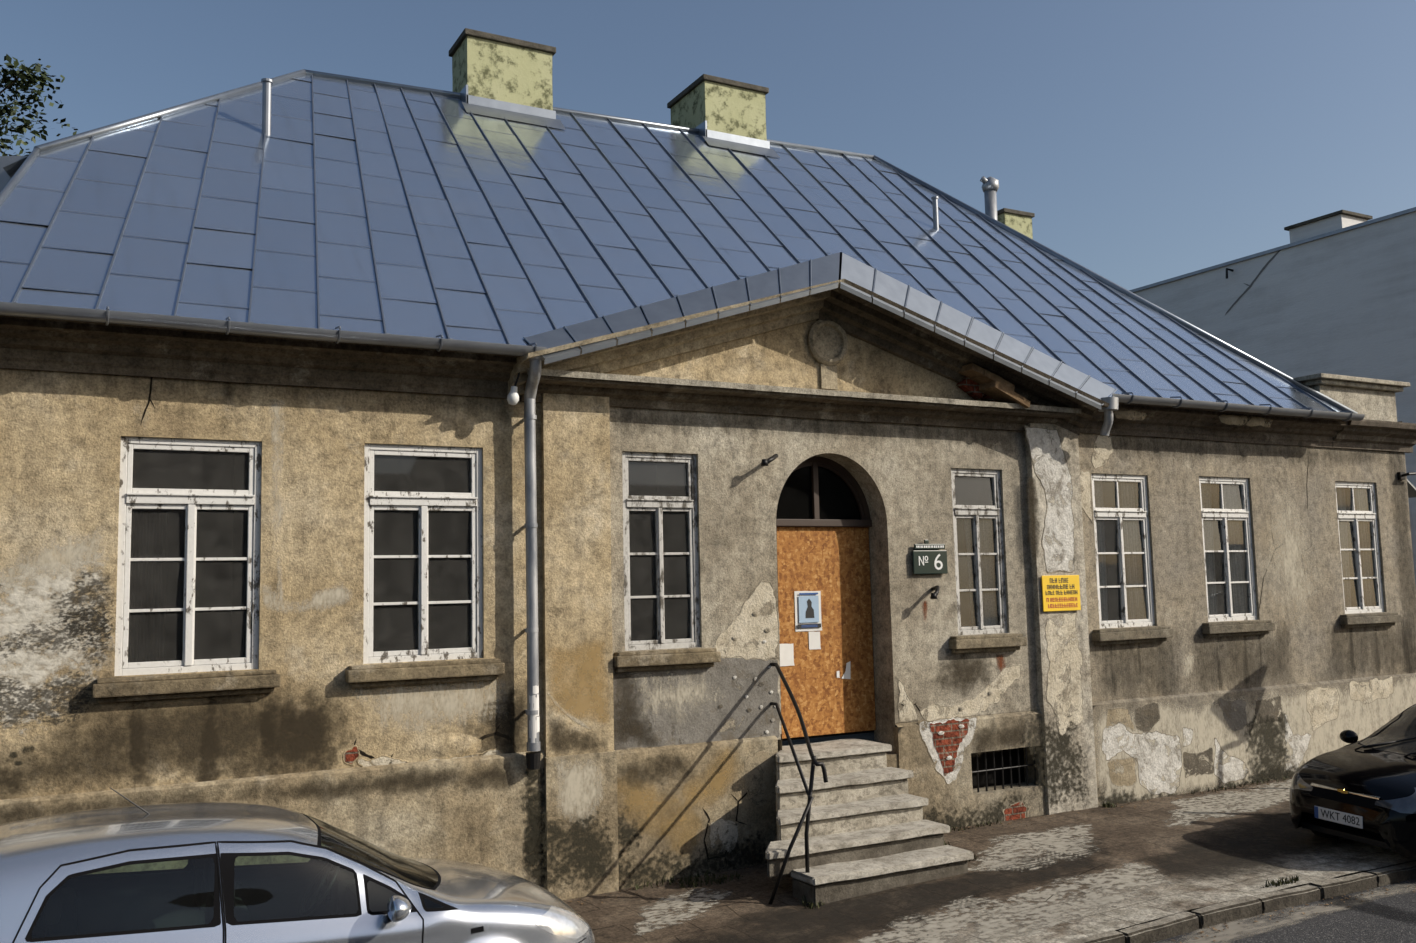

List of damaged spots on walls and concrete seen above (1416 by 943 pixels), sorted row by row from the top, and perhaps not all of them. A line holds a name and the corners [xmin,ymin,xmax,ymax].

crack [141,377,155,423]
peeling [1024,425,1114,574]
peeling [713,580,780,809]
spalling [897,664,1022,785]
peeling [1045,611,1084,736]
peeling [1102,675,1394,795]
water stain [1194,713,1304,792]